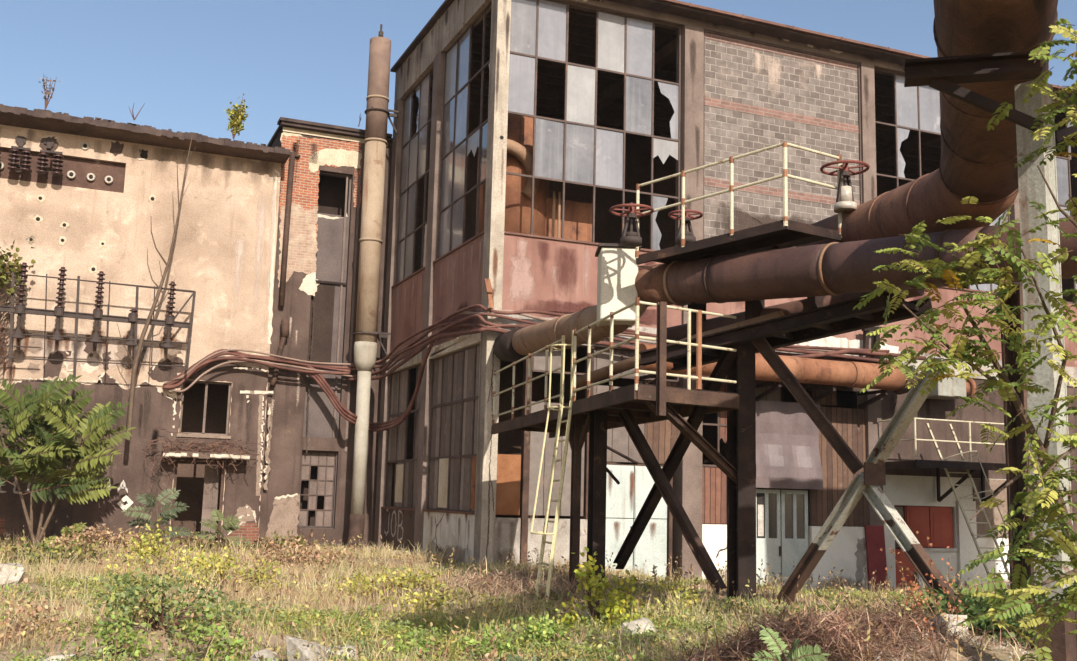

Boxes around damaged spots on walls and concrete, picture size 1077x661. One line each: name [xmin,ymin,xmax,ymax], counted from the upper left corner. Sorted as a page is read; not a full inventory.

flaking render [268,132,362,344]
damp [510,240,533,299]
rust [541,243,574,284]
rust [538,301,593,316]
flaking render [0,337,300,547]